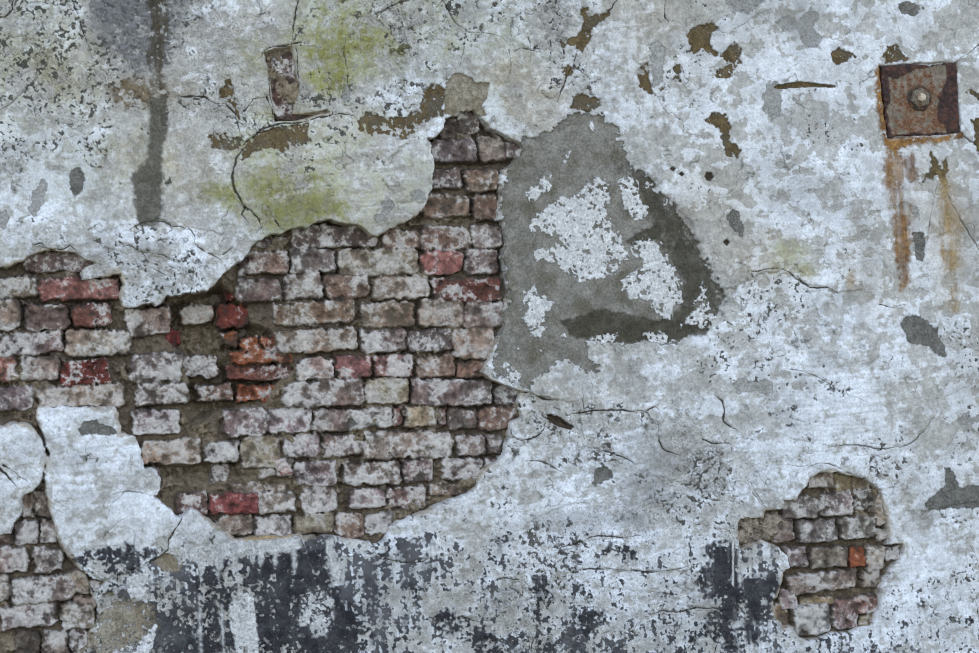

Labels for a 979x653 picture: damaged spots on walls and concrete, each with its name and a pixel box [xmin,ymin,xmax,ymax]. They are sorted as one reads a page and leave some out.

peeling [687,23,742,79]
leakage [90,0,181,226]
crack [182,0,358,229]
rust [875,66,963,287]
spalling [0,73,725,653]
crack [510,392,679,474]
crack [702,395,739,451]
peeling [925,467,979,511]
leakage [72,544,159,579]
leakage [196,537,374,653]
leakage [694,539,780,649]
spalling [737,472,905,642]